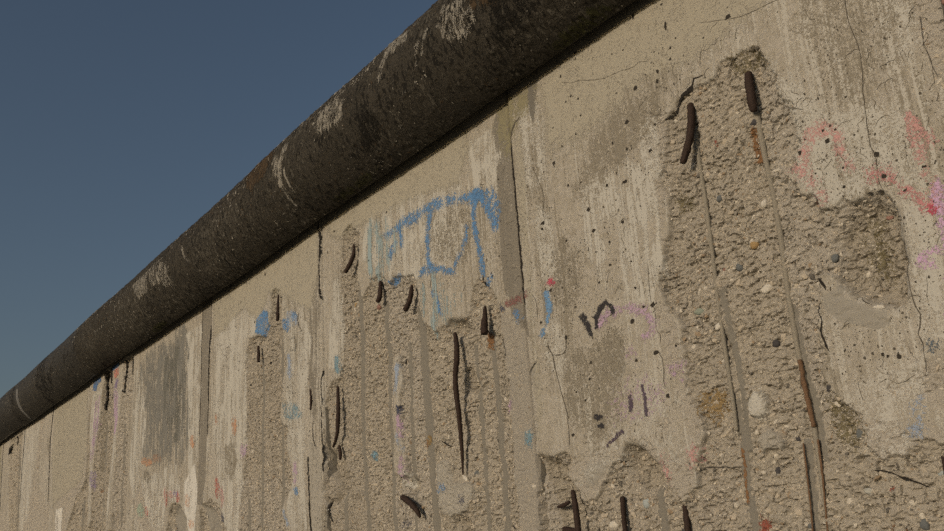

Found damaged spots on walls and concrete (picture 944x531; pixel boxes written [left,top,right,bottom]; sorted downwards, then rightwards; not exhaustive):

spalling [323,42,944,531]
crack [562,0,776,403]
crack [777,0,938,188]